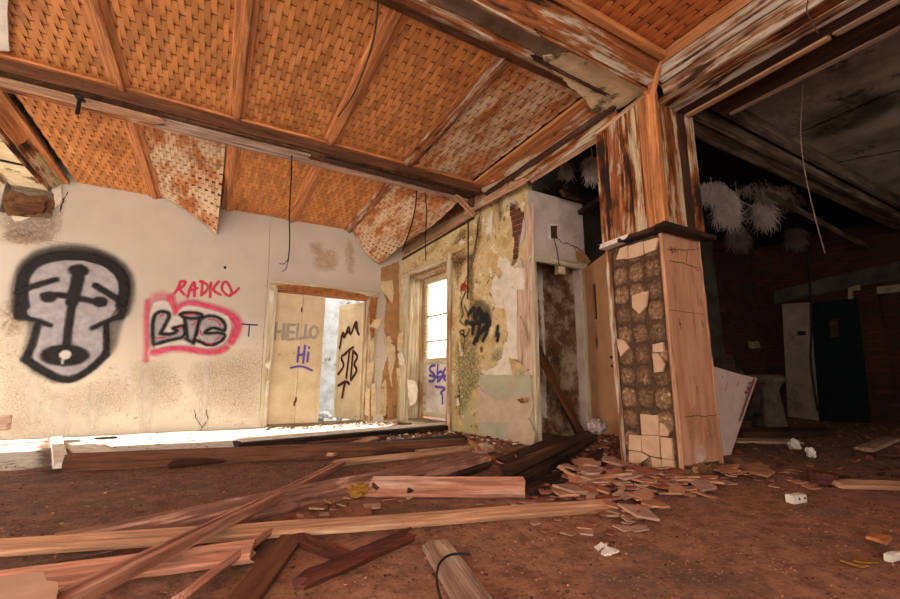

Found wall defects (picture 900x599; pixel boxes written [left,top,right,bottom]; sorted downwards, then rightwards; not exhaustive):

peeling [269,261,418,421]
peeling [485,199,548,418]